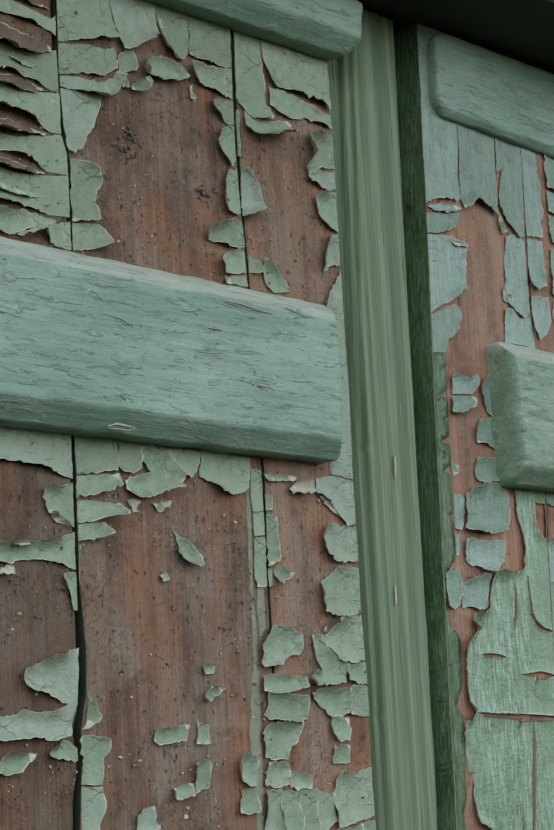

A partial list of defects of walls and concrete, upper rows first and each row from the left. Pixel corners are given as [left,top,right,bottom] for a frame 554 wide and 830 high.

peeling [416,23,554,721]
peeling [0,0,376,830]
crack [512,576,553,633]
crack [482,651,506,659]
crack [520,668,554,685]
crack [478,703,554,830]
peeling [464,773,491,830]